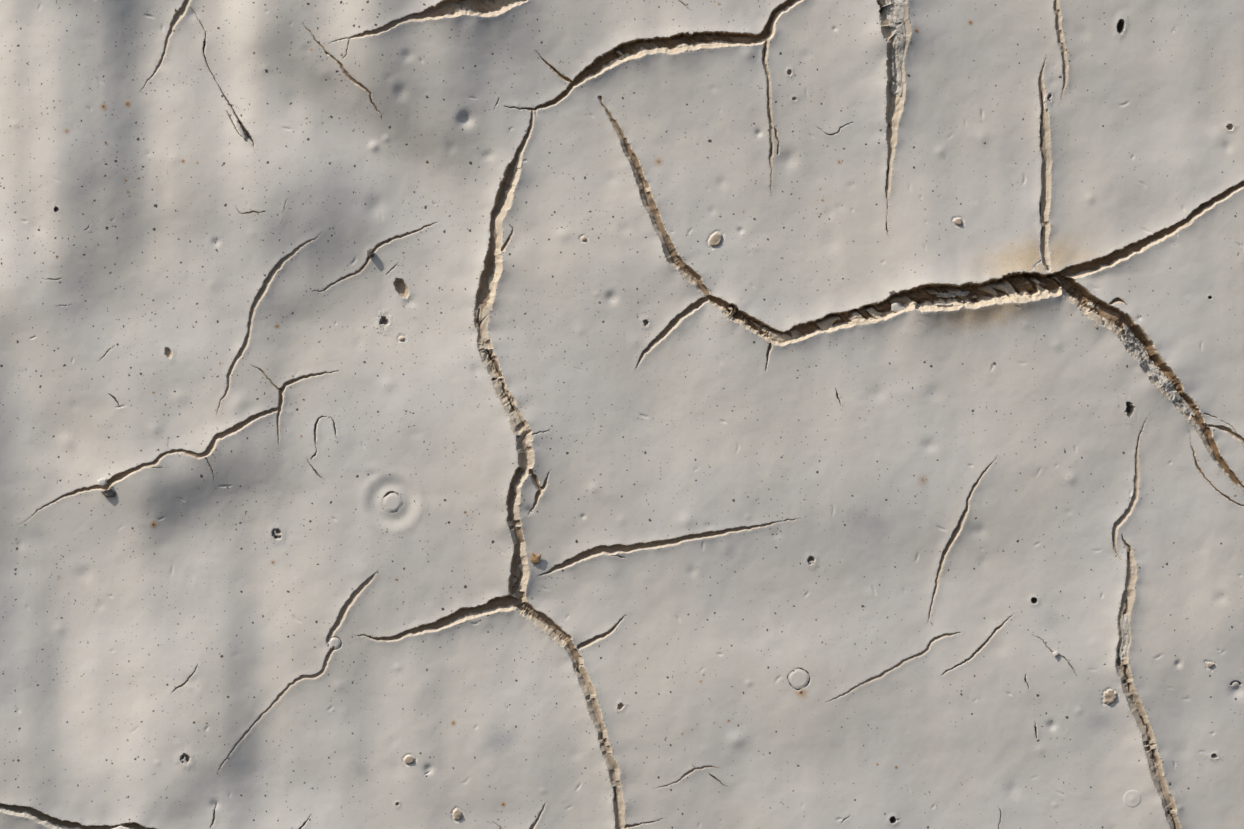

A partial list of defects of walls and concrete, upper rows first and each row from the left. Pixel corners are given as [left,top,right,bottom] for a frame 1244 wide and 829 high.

crack [137,0,259,155]
crack [13,230,344,529]
crack [214,0,810,829]
crack [595,0,1244,510]
crack [820,452,1081,746]
crack [1109,410,1185,829]
crack [0,800,161,829]
crack [207,794,222,829]